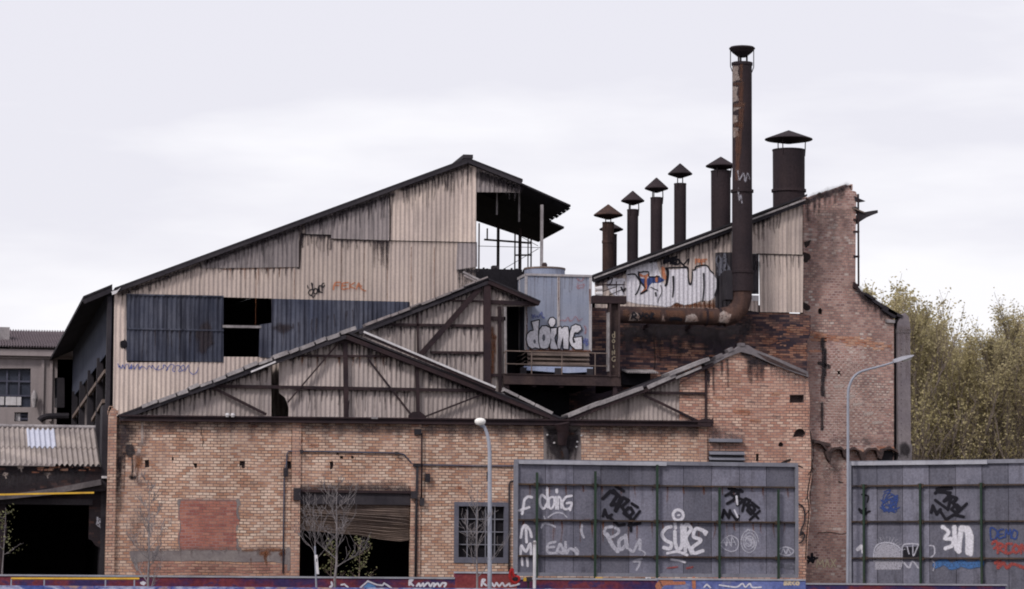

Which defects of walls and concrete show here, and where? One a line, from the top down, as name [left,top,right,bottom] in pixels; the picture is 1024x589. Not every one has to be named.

water stain [118,164,521,299]
rust [671,300,715,309]
spalling [759,325,894,476]